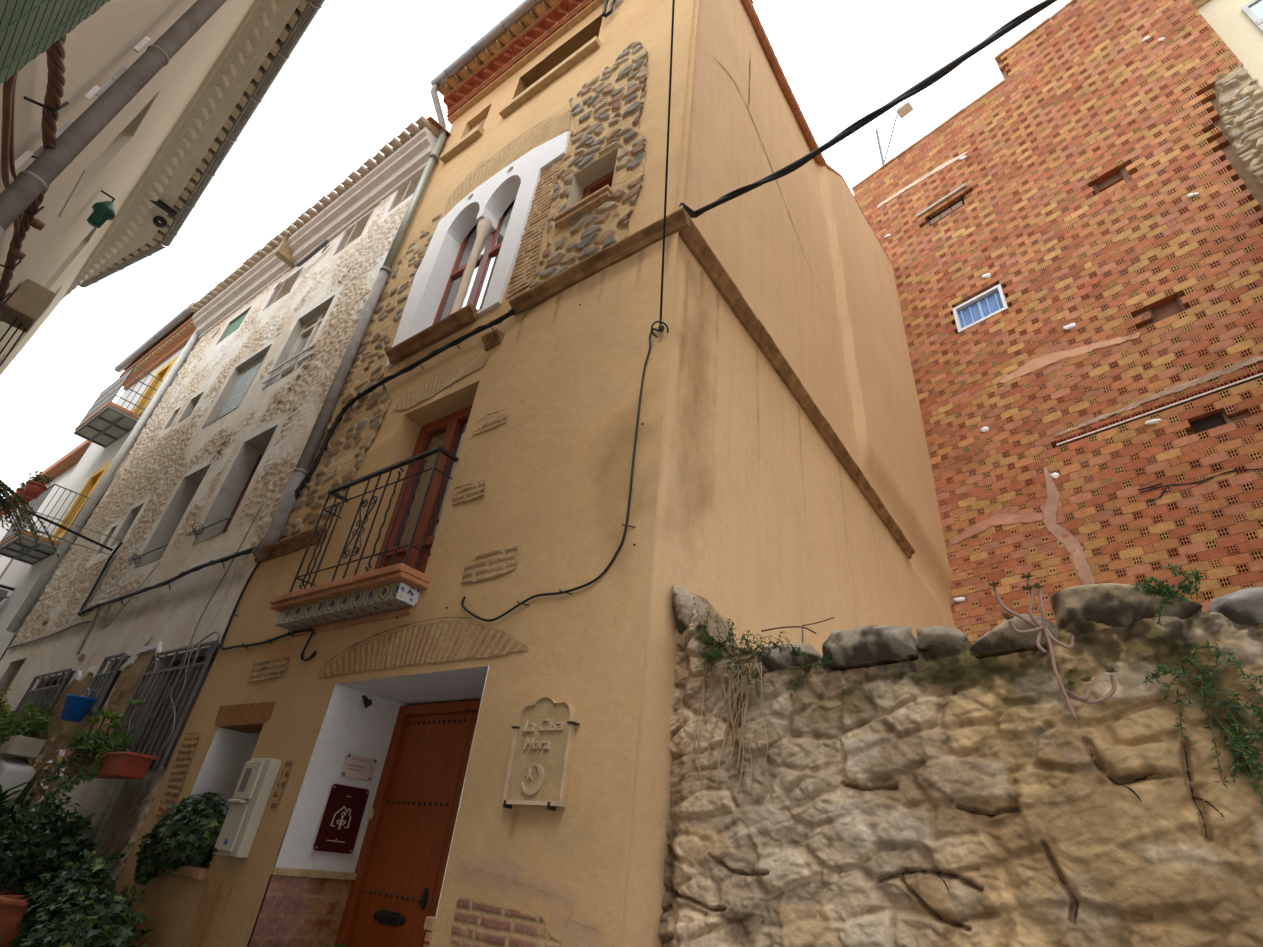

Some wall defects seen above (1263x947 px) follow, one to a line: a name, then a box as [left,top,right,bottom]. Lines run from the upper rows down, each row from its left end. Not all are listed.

flaking render [451,897,561,947]